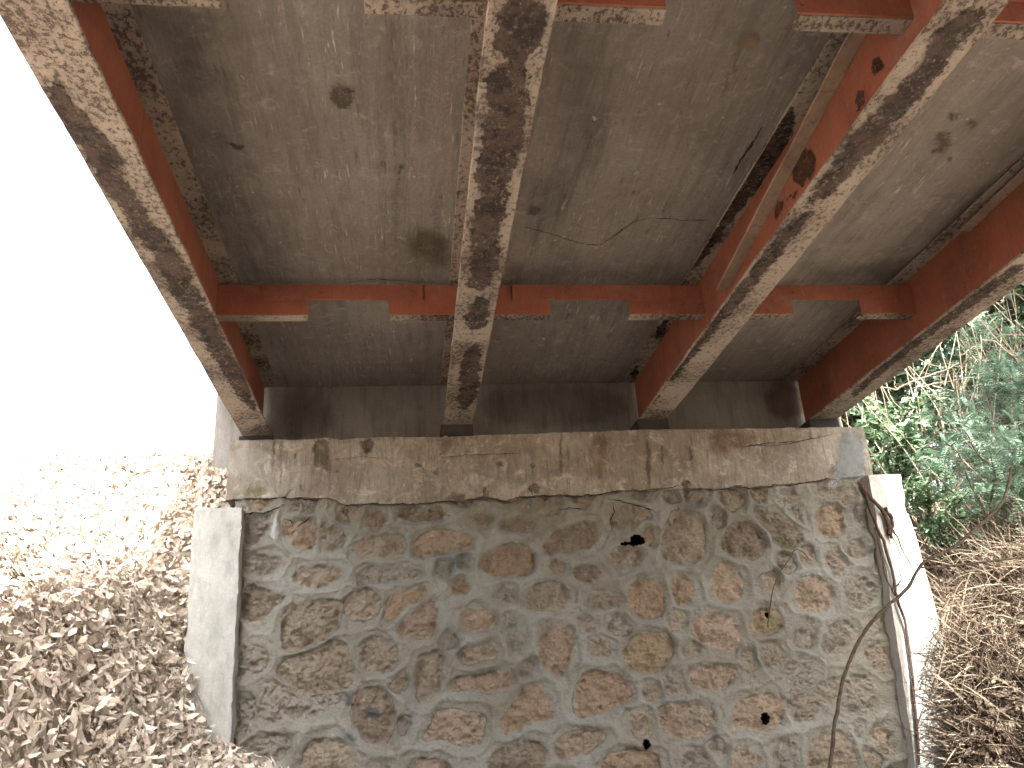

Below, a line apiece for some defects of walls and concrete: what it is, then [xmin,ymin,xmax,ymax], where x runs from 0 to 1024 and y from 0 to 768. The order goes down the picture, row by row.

crack [733,128,762,175]
corrosion [652,6,988,405]
crack [526,218,703,245]
crack [741,435,828,449]
crack [226,478,829,527]